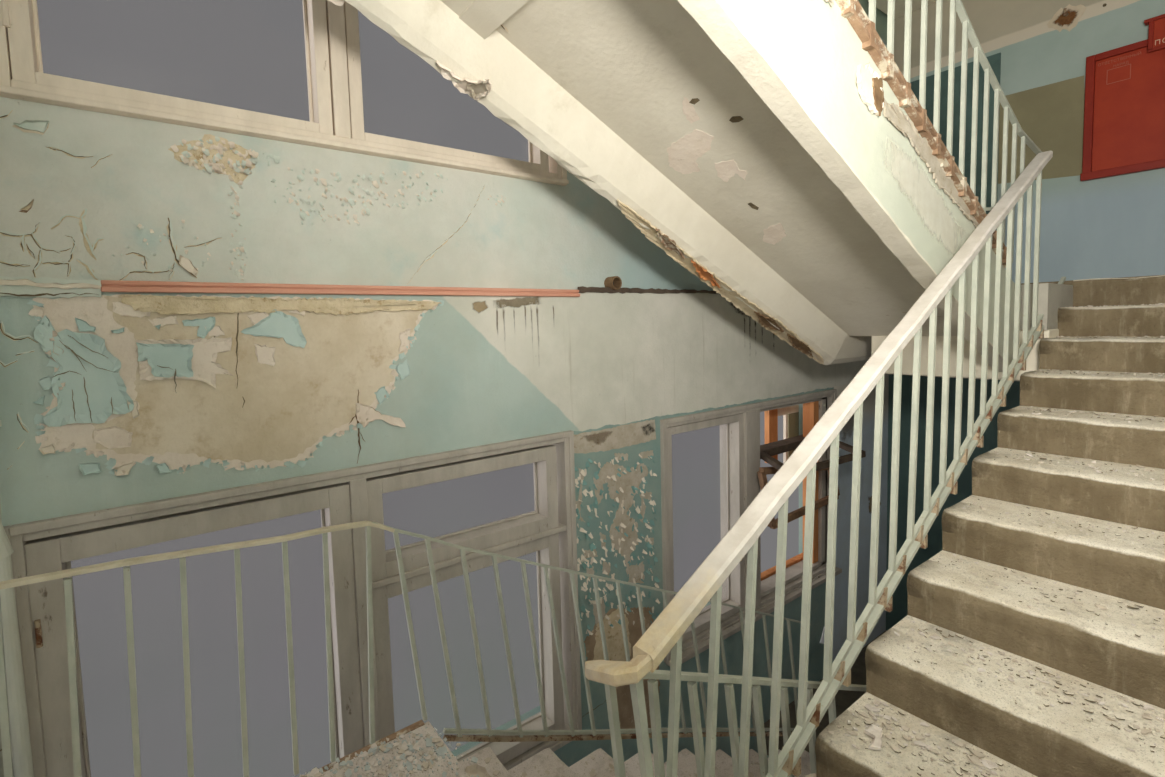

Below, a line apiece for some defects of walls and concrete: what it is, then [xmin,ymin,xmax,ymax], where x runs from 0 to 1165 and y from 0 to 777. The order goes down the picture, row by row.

crack [46,145,113,168]
spalling [436,60,491,100]
spalling [856,63,983,227]
spalling [617,200,824,365]
peeling [28,294,444,476]
crack [350,390,364,463]
peeling [574,419,660,661]
peeling [606,666,660,733]